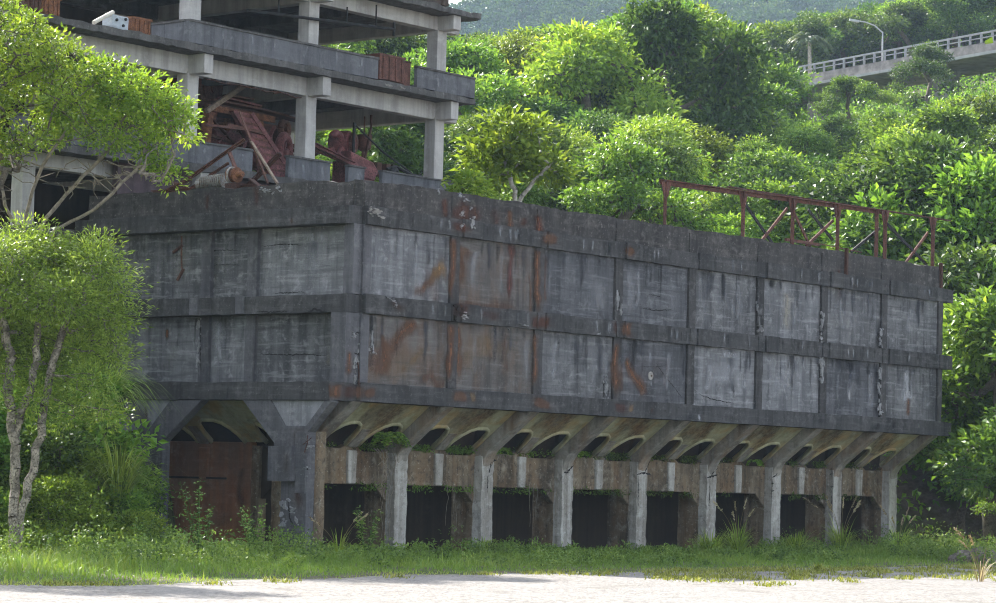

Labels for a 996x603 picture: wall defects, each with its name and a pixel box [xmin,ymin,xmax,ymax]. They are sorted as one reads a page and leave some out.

spalling [458,193,476,229]
spalling [278,498,299,527]